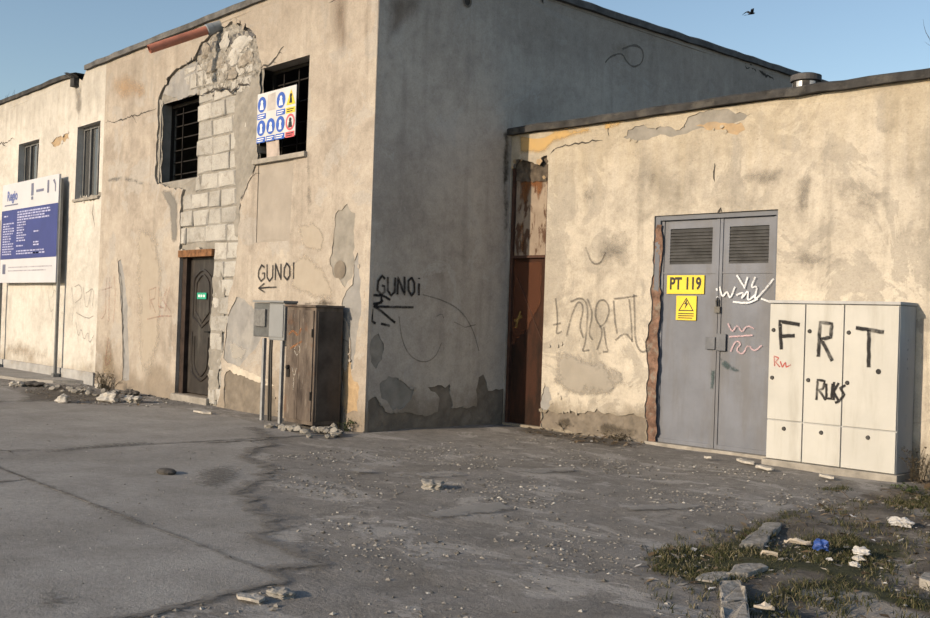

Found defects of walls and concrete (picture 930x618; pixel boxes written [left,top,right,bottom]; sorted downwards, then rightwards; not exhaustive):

crack [105,109,155,123]
peeling [624,109,748,143]
spalling [157,17,278,417]
corrosion [520,178,542,202]
peeling [330,204,504,432]
corrosion [512,223,542,344]